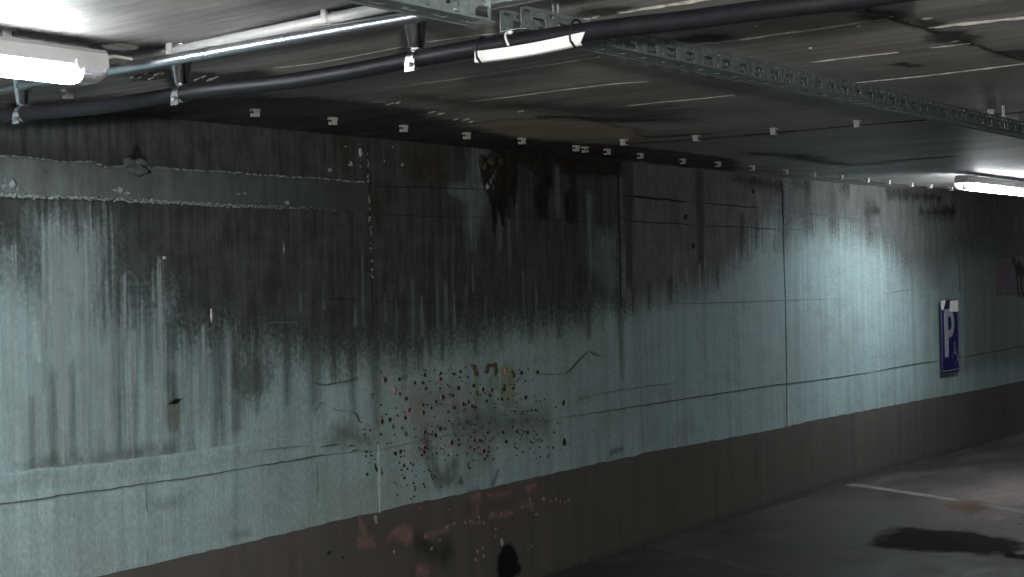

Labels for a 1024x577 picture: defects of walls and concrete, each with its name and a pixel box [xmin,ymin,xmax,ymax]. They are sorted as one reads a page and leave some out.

water stain [0,113,1024,465]
corrosion [364,362,558,500]
crack [0,346,1023,504]